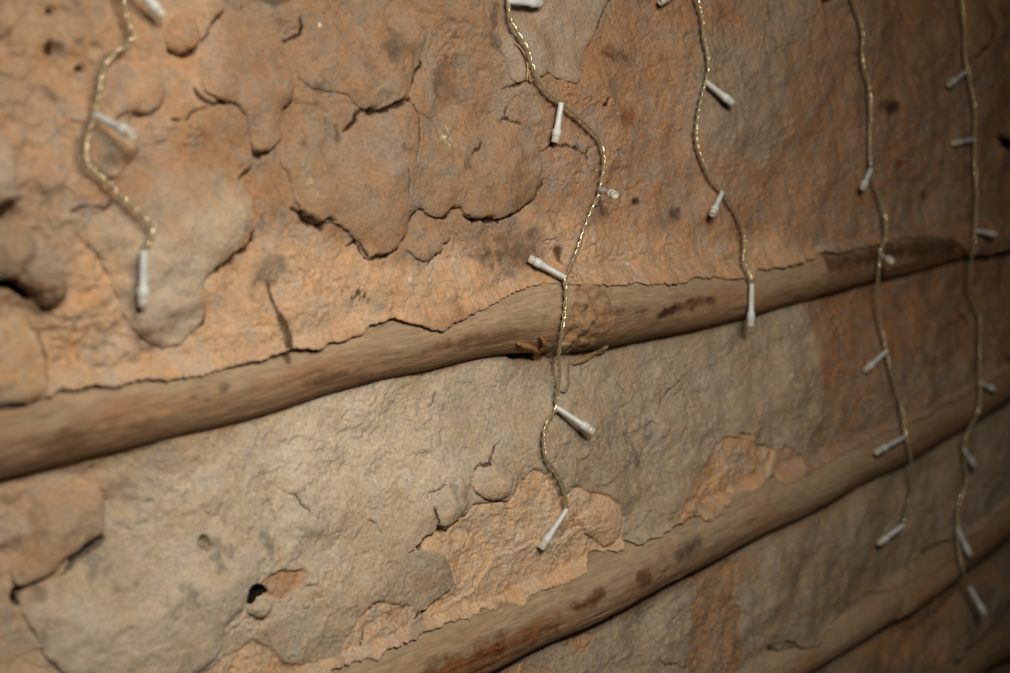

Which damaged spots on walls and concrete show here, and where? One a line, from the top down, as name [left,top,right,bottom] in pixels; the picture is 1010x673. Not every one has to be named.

crack [500,82,523,125]
crack [238,141,280,181]
crack [342,55,434,261]
crack [538,142,595,159]
crack [289,207,339,232]
crack [426,179,543,265]
crack [206,228,255,279]
spalling [679,434,773,521]
spalling [197,534,213,553]
spalling [202,469,623,673]